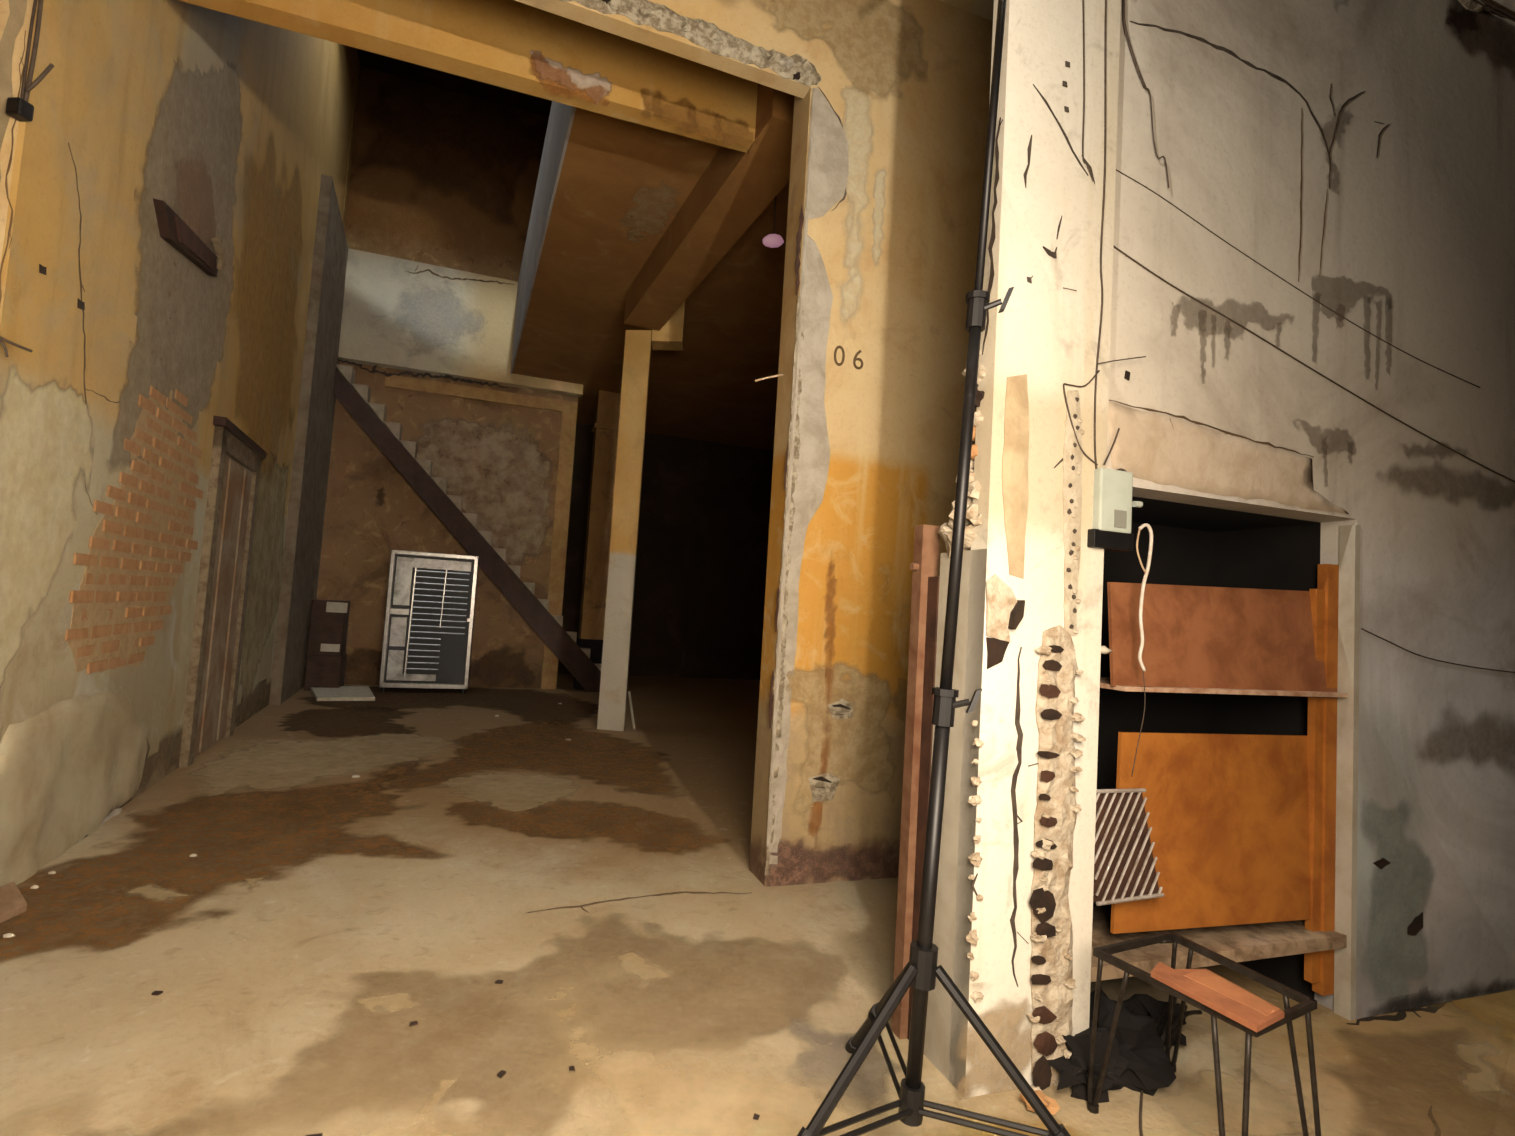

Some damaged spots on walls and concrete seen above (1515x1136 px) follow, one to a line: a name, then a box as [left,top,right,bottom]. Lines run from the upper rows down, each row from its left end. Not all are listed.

peeling [0,0,27,181]
crack [1130,20,1389,282]
peeling [0,62,243,687]
peeling [559,0,925,875]
spalling [938,348,986,557]
peeling [986,374,1029,669]
crack [1109,400,1314,457]
water stain [0,646,728,962]
flaking render [1027,390,1086,1093]
water stain [154,918,897,1136]
water stain [959,1005,1032,1100]
water stain [975,1124,1048,1136]